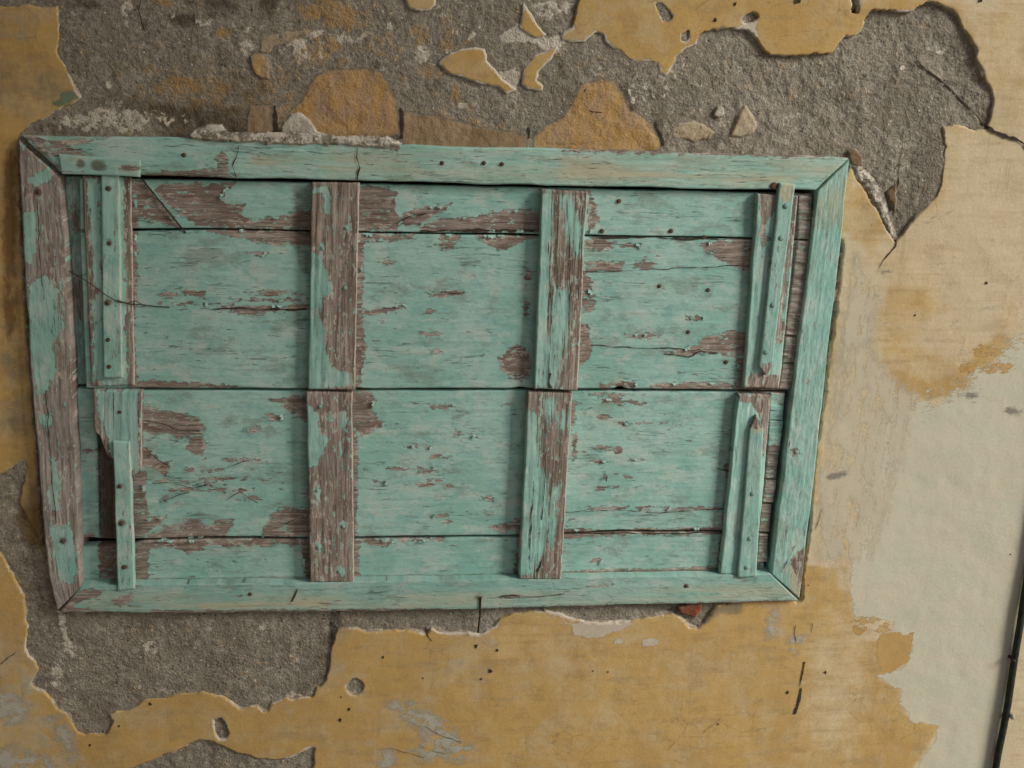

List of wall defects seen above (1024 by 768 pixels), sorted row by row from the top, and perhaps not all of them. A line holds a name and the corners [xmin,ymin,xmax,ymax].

spalling [0,0,992,240]
crack [910,49,1024,145]
spalling [0,461,714,763]
peeling [804,303,1024,768]
spalling [133,718,314,768]